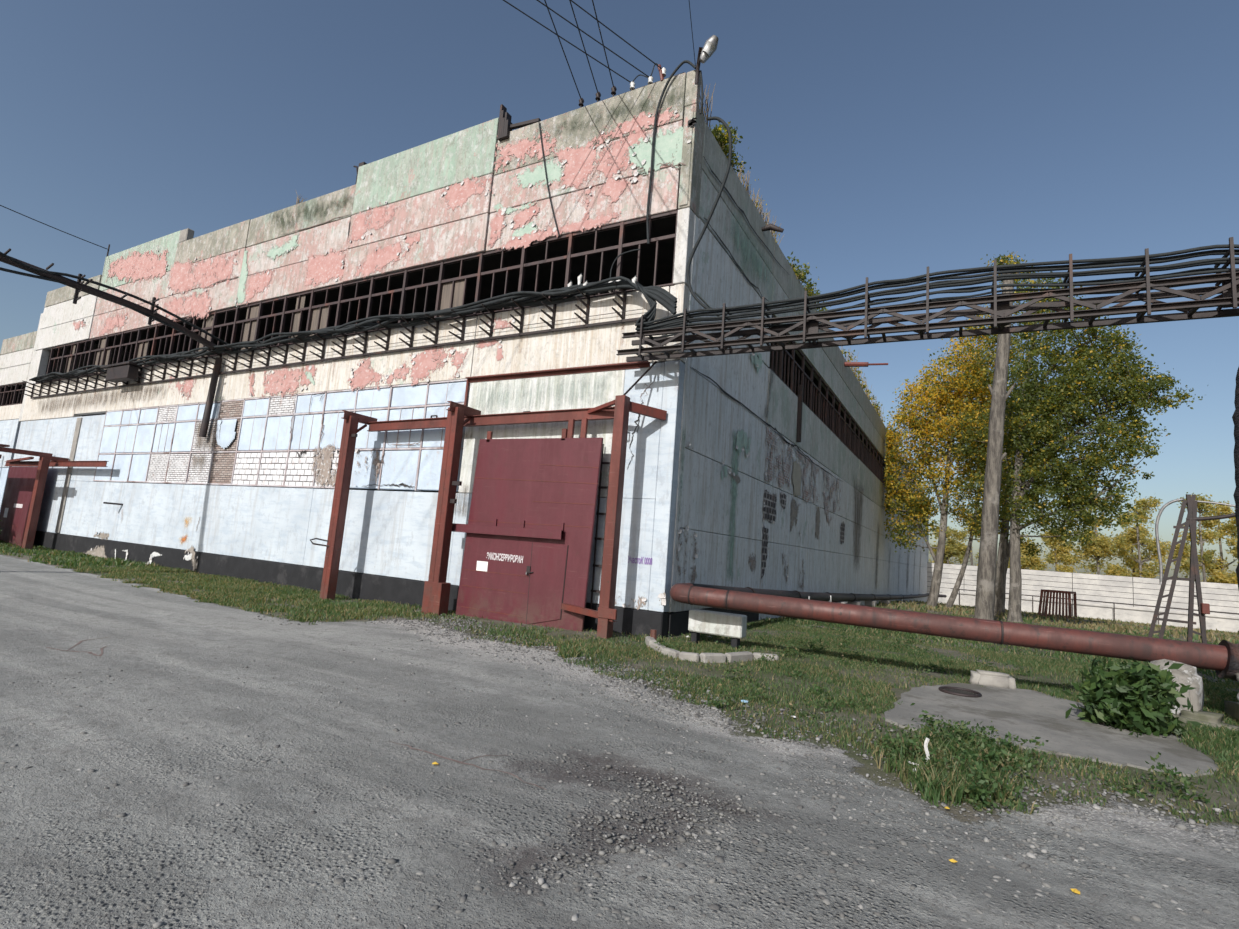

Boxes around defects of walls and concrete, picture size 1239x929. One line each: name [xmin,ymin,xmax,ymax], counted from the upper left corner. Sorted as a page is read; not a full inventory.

peeling [441,105,691,251]
peeling [105,201,420,321]
peeling [249,364,319,398]
leakage [729,437,739,576]
flaking render [748,427,845,590]